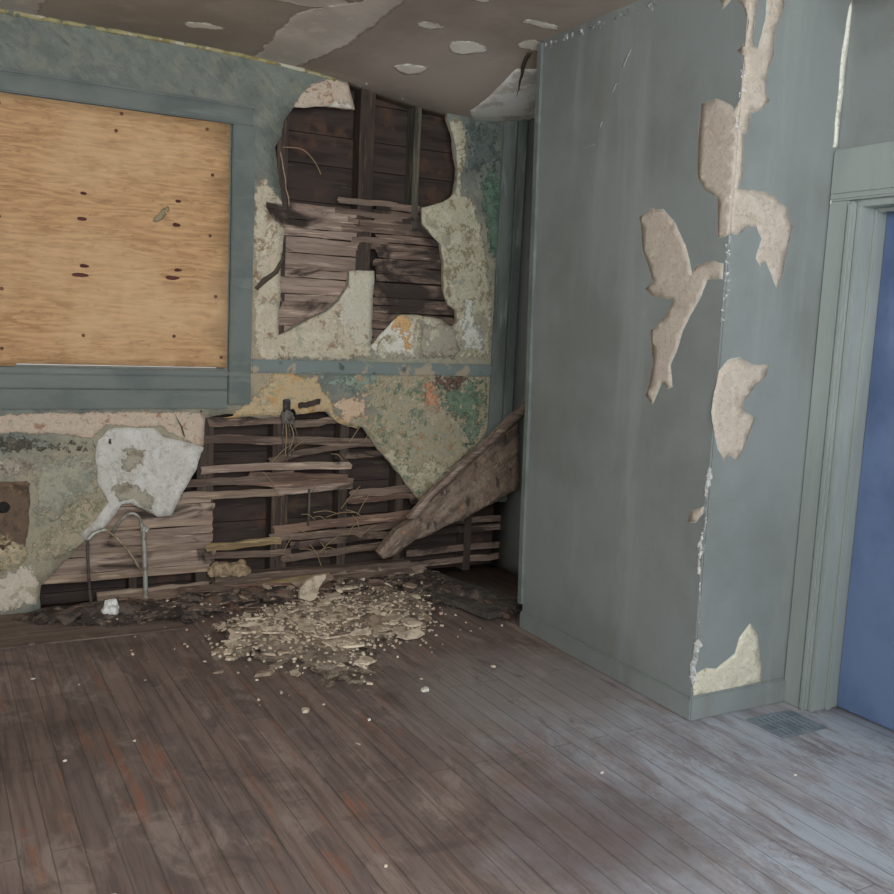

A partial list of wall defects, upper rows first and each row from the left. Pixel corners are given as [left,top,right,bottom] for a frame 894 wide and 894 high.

spalling [252,79,500,361]
peeling [639,0,793,404]
spalling [0,374,501,612]
peeling [688,357,770,601]
peeling [689,623,762,696]